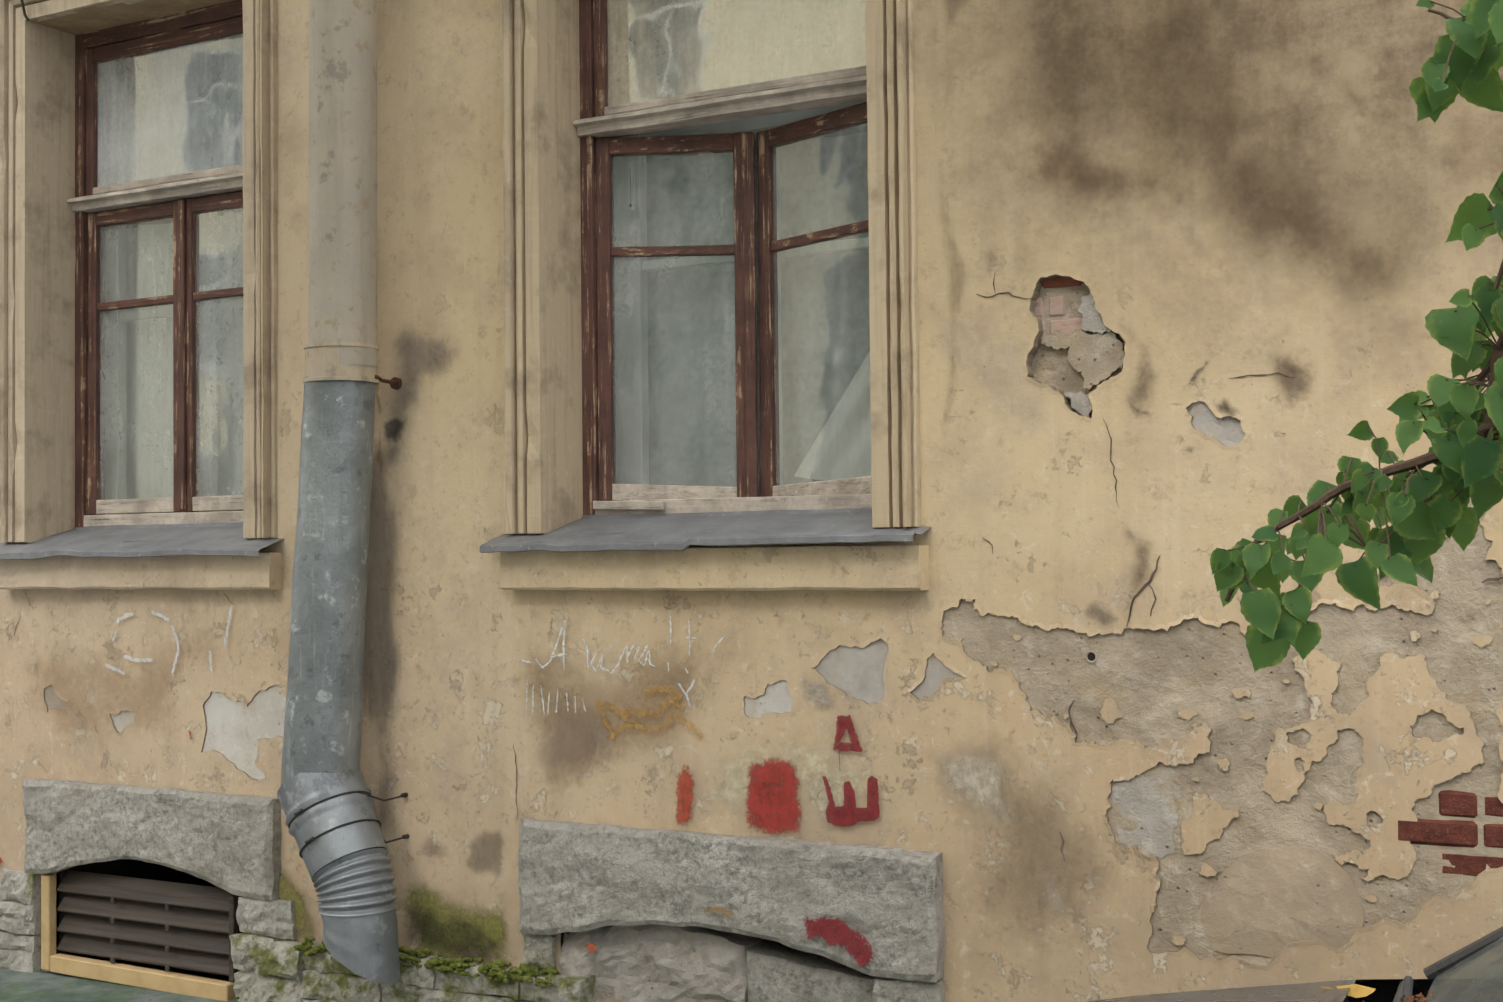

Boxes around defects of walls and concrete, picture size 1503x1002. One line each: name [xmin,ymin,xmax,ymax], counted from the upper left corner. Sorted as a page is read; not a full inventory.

flaking render [1022,270,1130,423]
peeling [1182,397,1250,450]
crack [1126,556,1160,628]
peeling [199,682,286,784]
peeling [740,676,796,722]
peeling [808,497,1503,971]